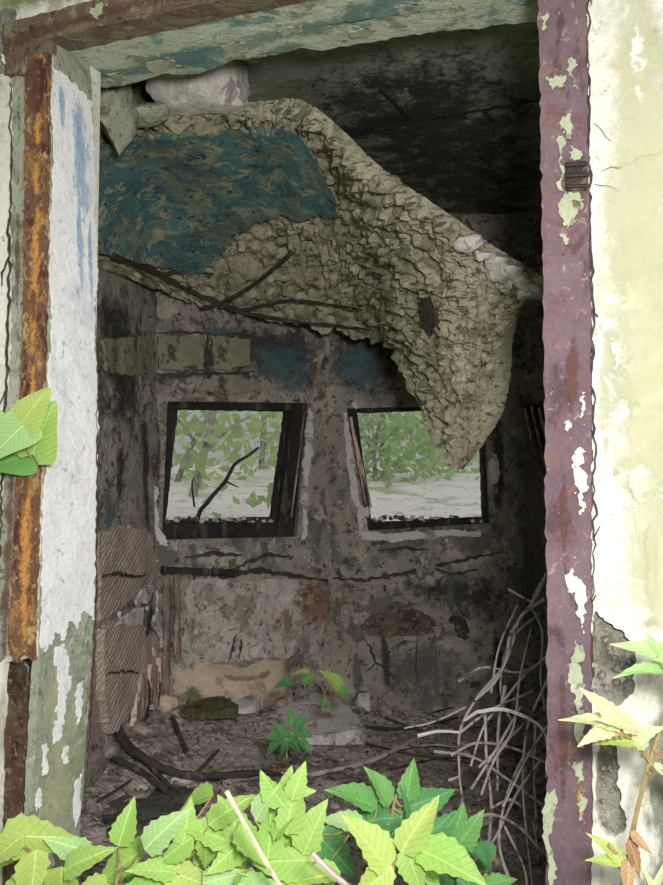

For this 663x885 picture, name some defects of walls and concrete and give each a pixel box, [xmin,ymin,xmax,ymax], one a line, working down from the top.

corrosion [5,0,158,54]
corrosion [27,59,42,195]
corrosion [15,209,41,354]
peeling [39,38,482,776]
spalling [546,0,636,748]
corrosion [1,474,31,655]
crack [84,398,170,813]
crack [229,636,243,659]
crack [185,545,497,583]
crack [363,634,420,691]
peeling [542,788,558,885]
spalling [572,740,627,835]